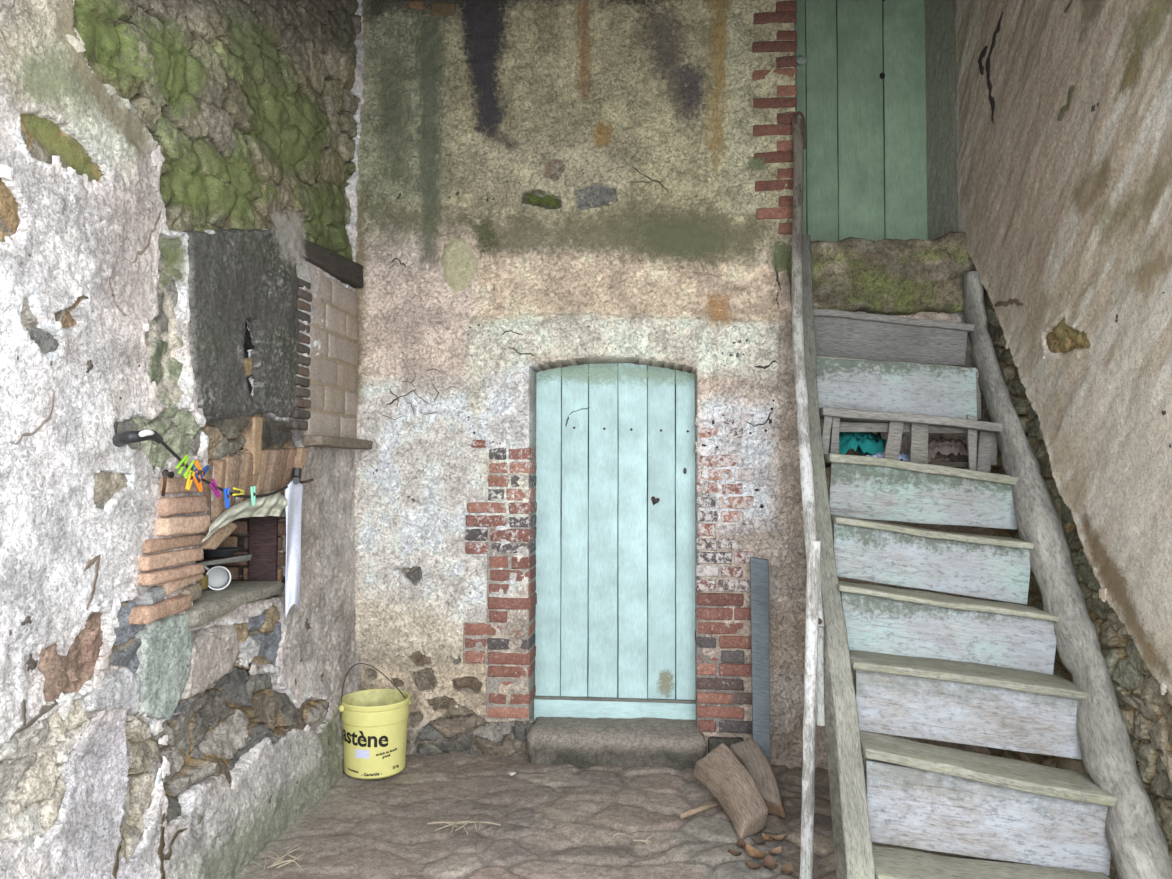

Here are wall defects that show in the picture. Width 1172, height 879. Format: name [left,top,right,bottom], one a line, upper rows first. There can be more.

flaking render [20,114,115,200]
flaking render [64,0,375,477]
damp [419,19,443,261]
damp [457,0,506,135]
damp [635,0,697,120]
crack [978,12,1003,124]
damp [1120,47,1140,91]
crack [382,368,459,420]
flaking render [359,416,537,758]
flaking render [694,399,774,734]
flaking render [984,287,1172,860]
flaking render [0,600,329,864]